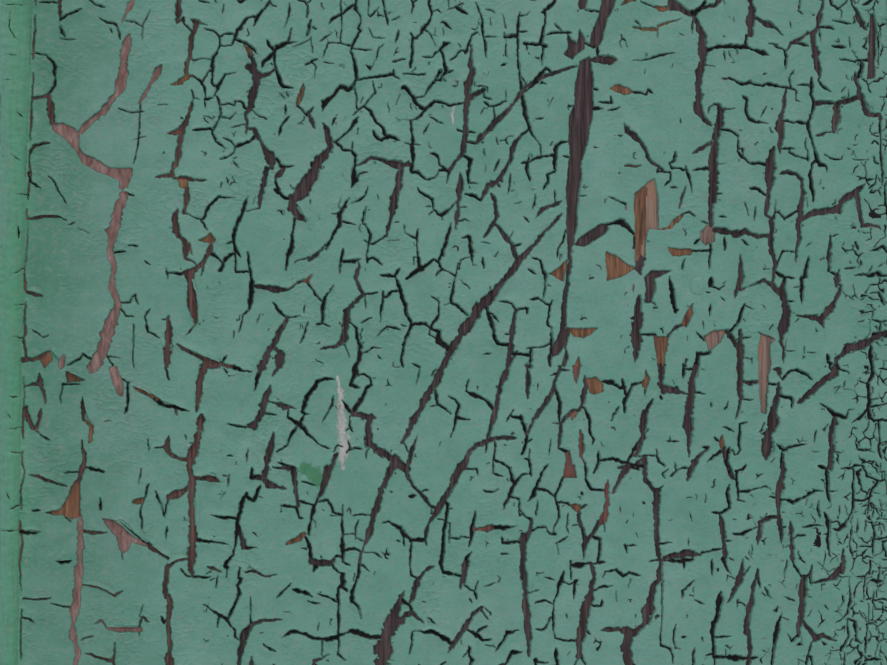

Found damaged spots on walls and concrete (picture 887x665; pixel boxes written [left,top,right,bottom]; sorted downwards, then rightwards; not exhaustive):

crack [35,53,57,94]
crack [6,0,120,55]
peeling [26,35,162,396]
peeling [523,0,714,367]
peeling [14,266,43,310]
crack [7,331,62,440]
crack [176,0,639,665]
crack [584,0,887,665]
peeling [743,334,776,413]
crack [31,396,103,486]
crack [19,528,37,536]
peeling [6,451,172,665]